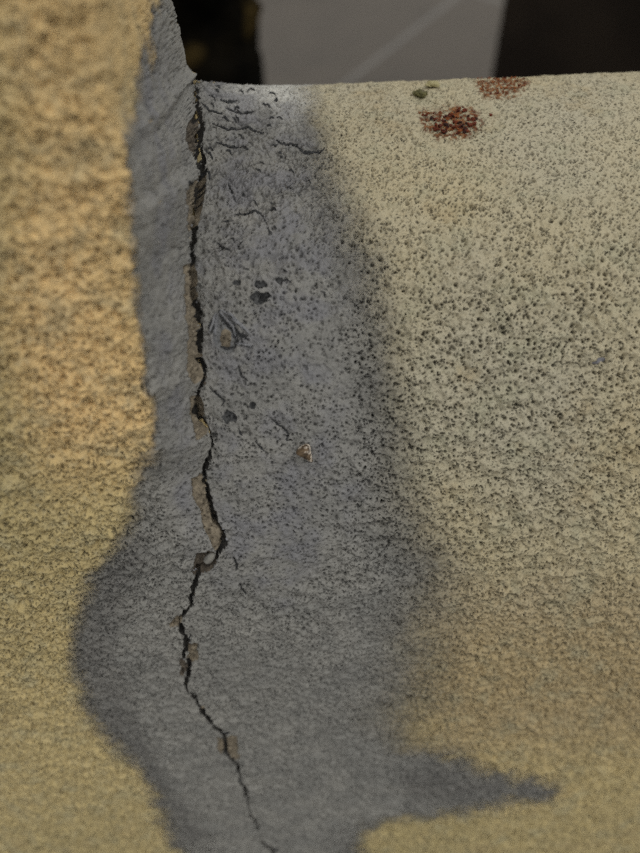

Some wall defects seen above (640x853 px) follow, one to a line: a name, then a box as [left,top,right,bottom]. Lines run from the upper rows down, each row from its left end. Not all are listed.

crack [169,79,325,853]